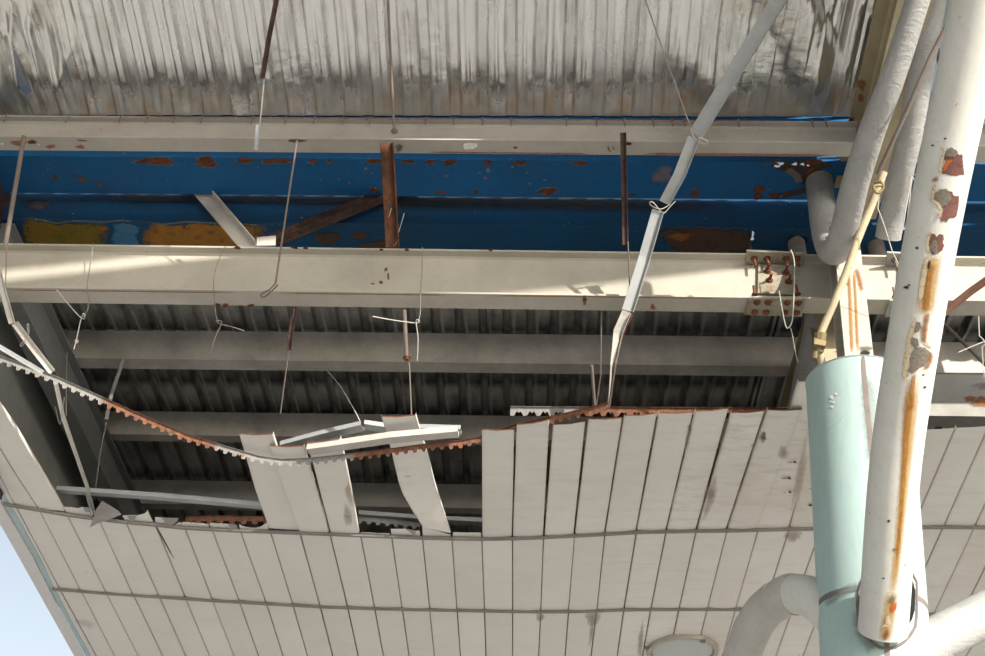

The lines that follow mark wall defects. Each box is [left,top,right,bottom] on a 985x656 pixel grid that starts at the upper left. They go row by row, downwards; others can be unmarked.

rust [134,157,174,165]
rust [196,156,216,168]
rust [426,147,587,166]
rust [694,153,824,176]
rust [538,187,557,195]
peeling [930,138,964,222]
rust [658,226,751,253]
peeling [915,231,944,255]
peeling [901,314,933,388]
rust [892,375,916,583]
rust [881,596,897,639]